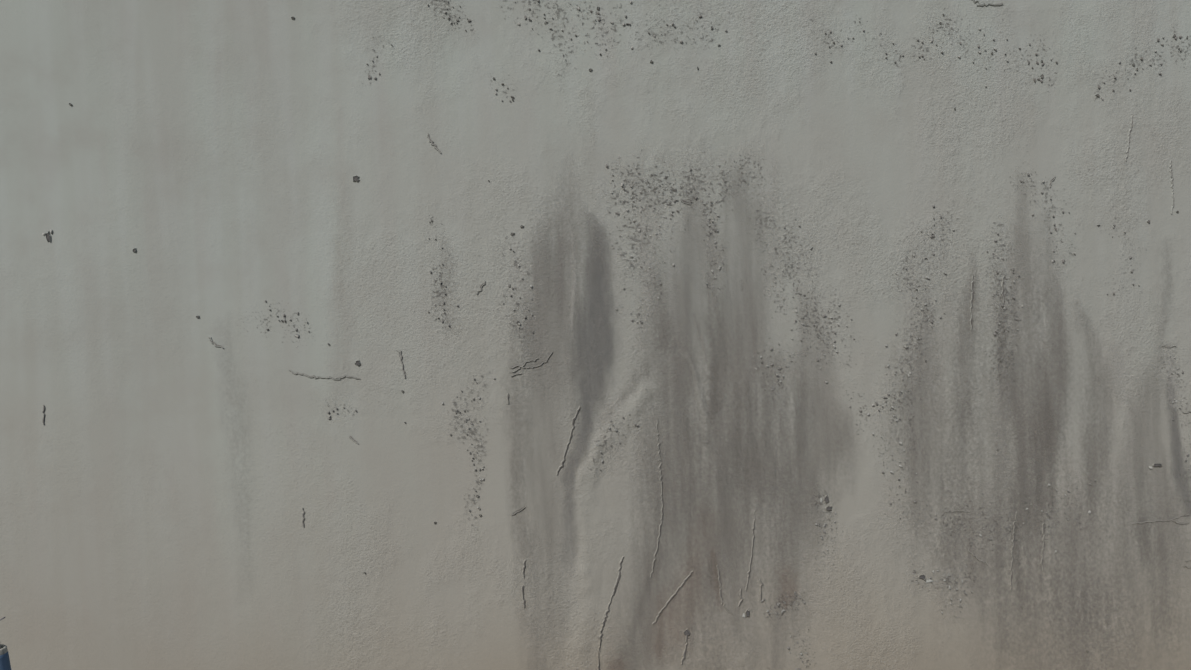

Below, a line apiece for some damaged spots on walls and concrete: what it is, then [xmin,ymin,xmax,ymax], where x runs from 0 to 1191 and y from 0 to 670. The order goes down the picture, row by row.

leakage [579,233,611,424]
crack [597,556,624,670]
crack [650,420,693,624]